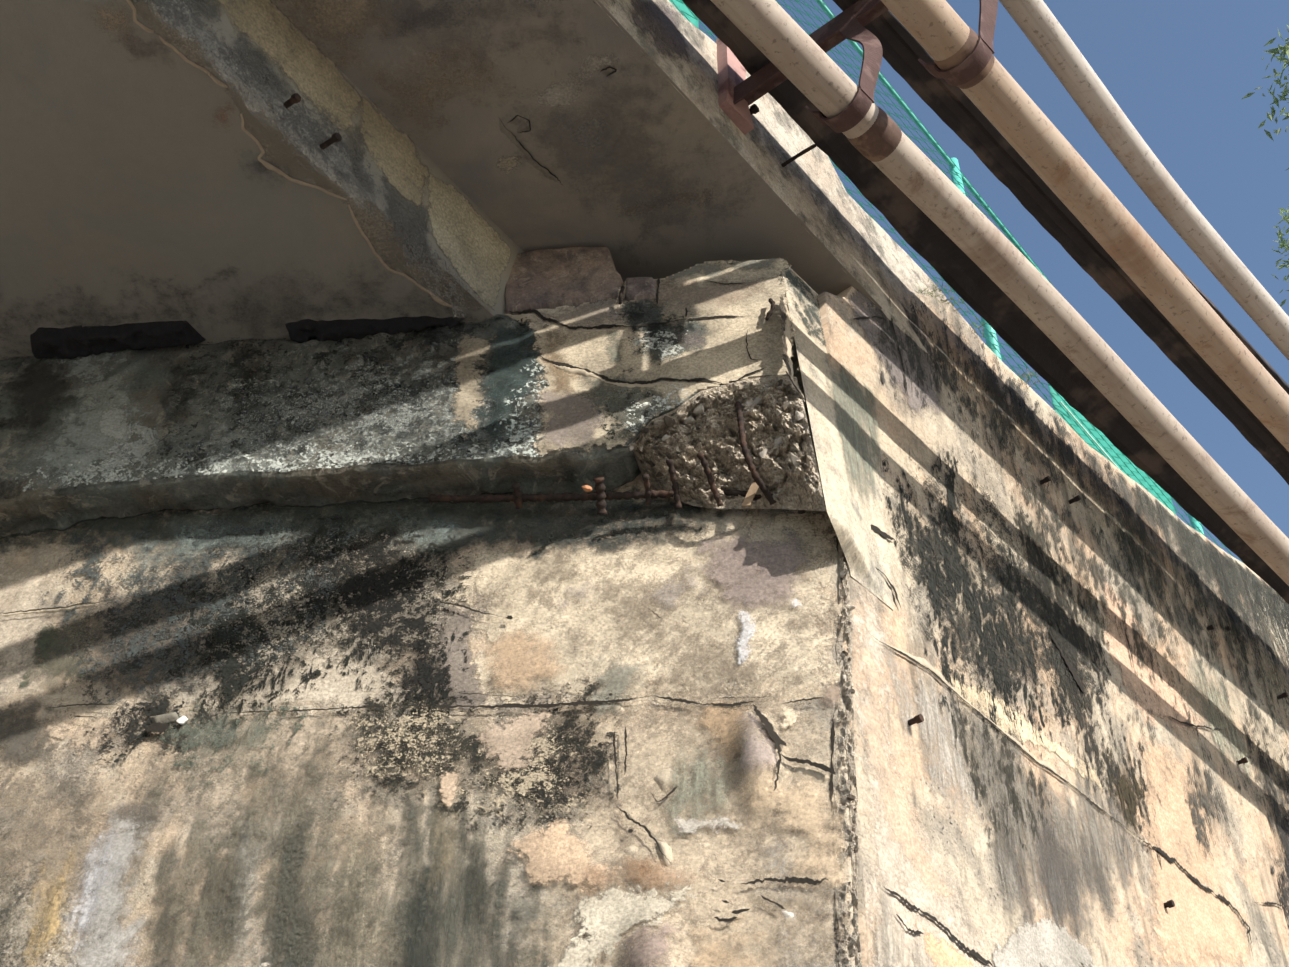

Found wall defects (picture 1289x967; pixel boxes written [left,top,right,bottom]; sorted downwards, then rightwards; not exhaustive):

crack [498,115,563,185]
damp [0,0,798,491]
spalling [428,294,826,515]
crack [504,278,805,402]
crack [46,701,119,718]
crack [224,692,835,866]
damp [0,297,1289,967]
spalling [833,542,862,967]
crack [871,525,895,541]
crack [876,568,902,612]
crack [866,633,1289,967]